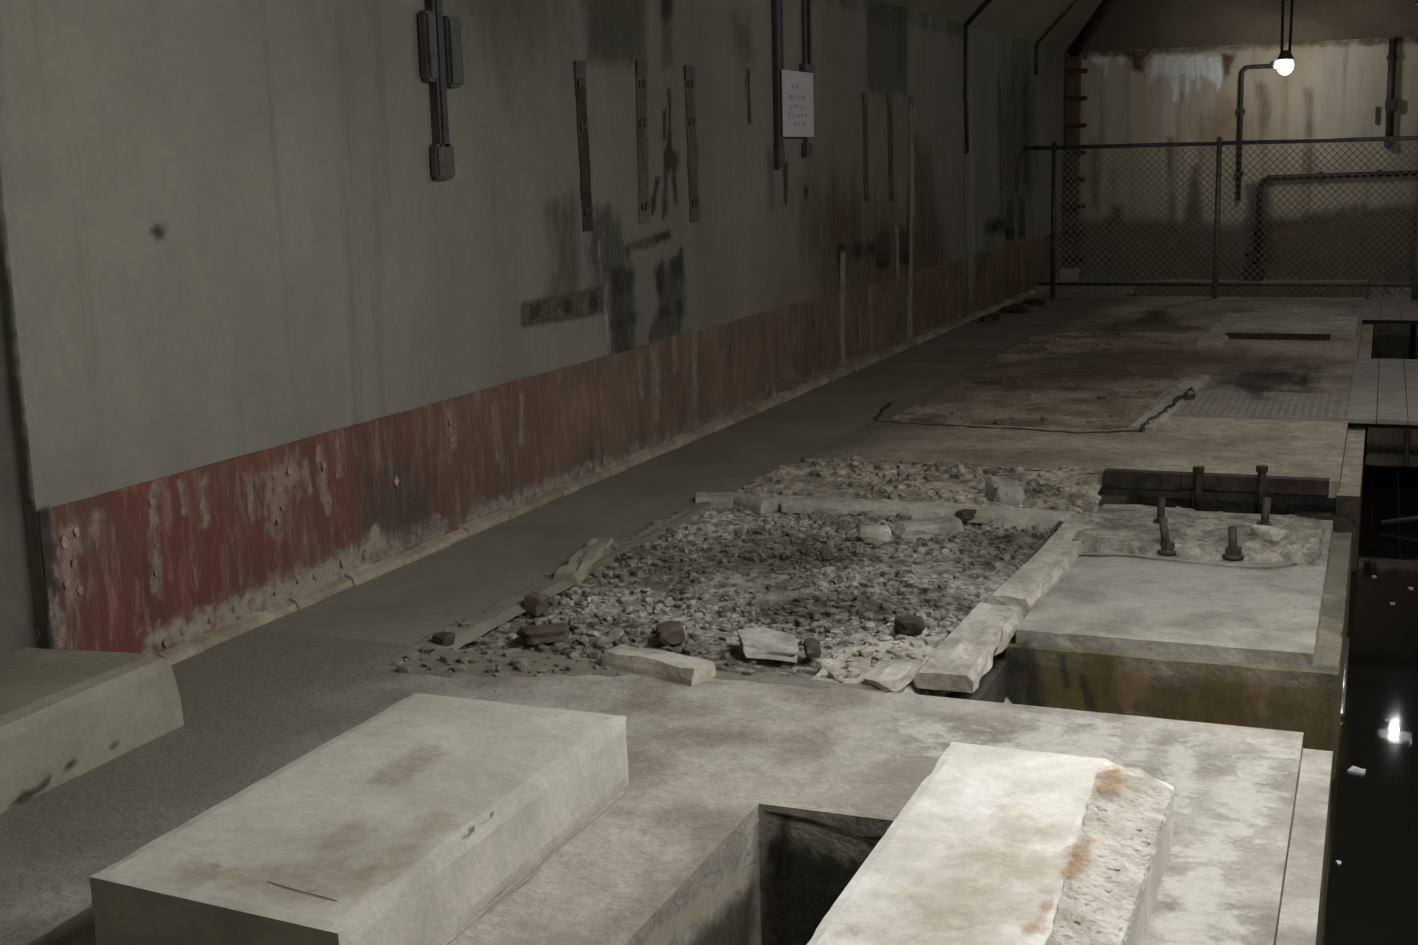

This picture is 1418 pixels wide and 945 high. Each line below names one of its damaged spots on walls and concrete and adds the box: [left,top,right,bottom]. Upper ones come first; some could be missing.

water stain [1149,54,1223,103]
water stain [593,91,684,352]
peeling [41,509,99,649]
peeling [143,326,902,654]
spalling [1044,765,1175,945]